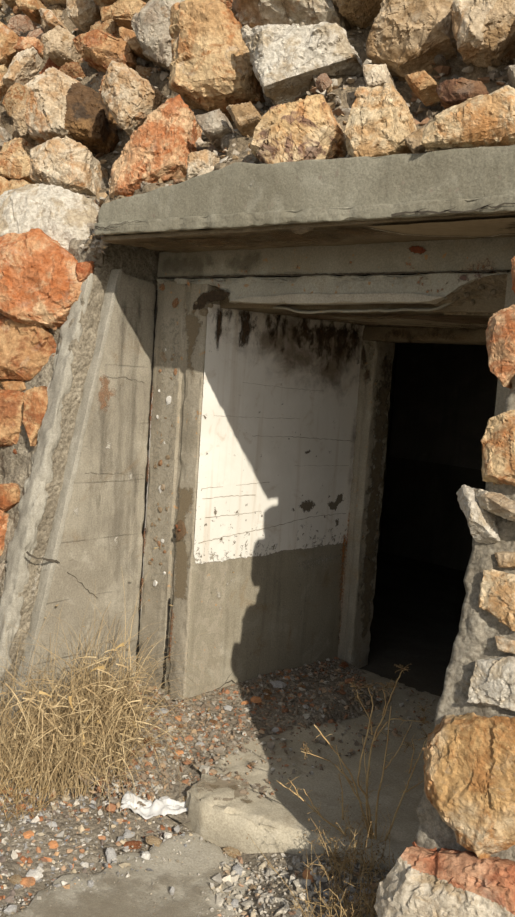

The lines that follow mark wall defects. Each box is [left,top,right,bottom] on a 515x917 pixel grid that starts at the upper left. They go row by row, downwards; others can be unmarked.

leakage [239,311,251,346]
leakage [261,312,489,384]
peeling [148,272,508,638]